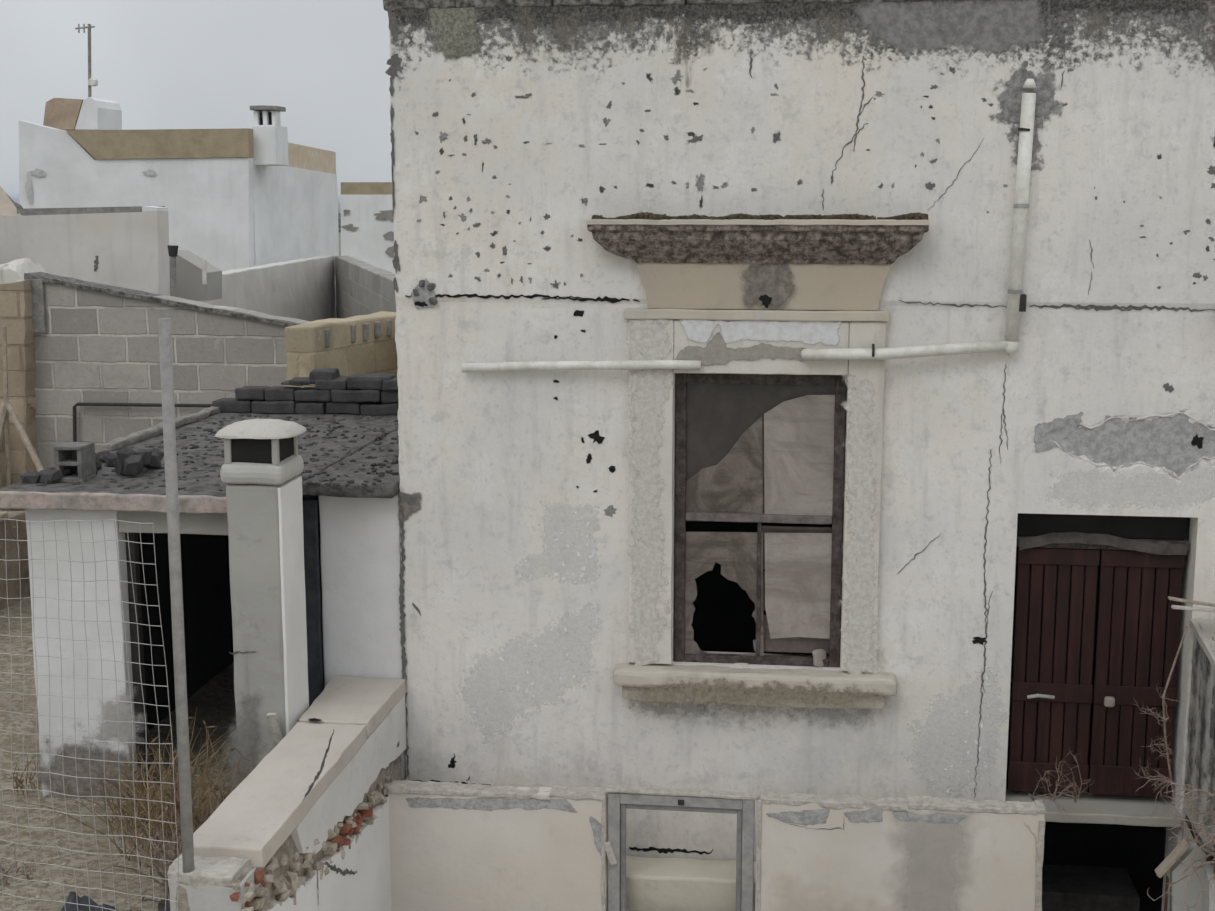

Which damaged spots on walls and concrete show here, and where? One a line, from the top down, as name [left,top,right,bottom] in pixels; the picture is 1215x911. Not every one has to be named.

damp [391,8,432,79]
damp [455,0,1215,72]
crack [821,56,873,210]
spalling [981,63,1067,170]
spalling [1034,411,1215,480]
crack [974,364,1009,798]
crack [297,730,334,828]